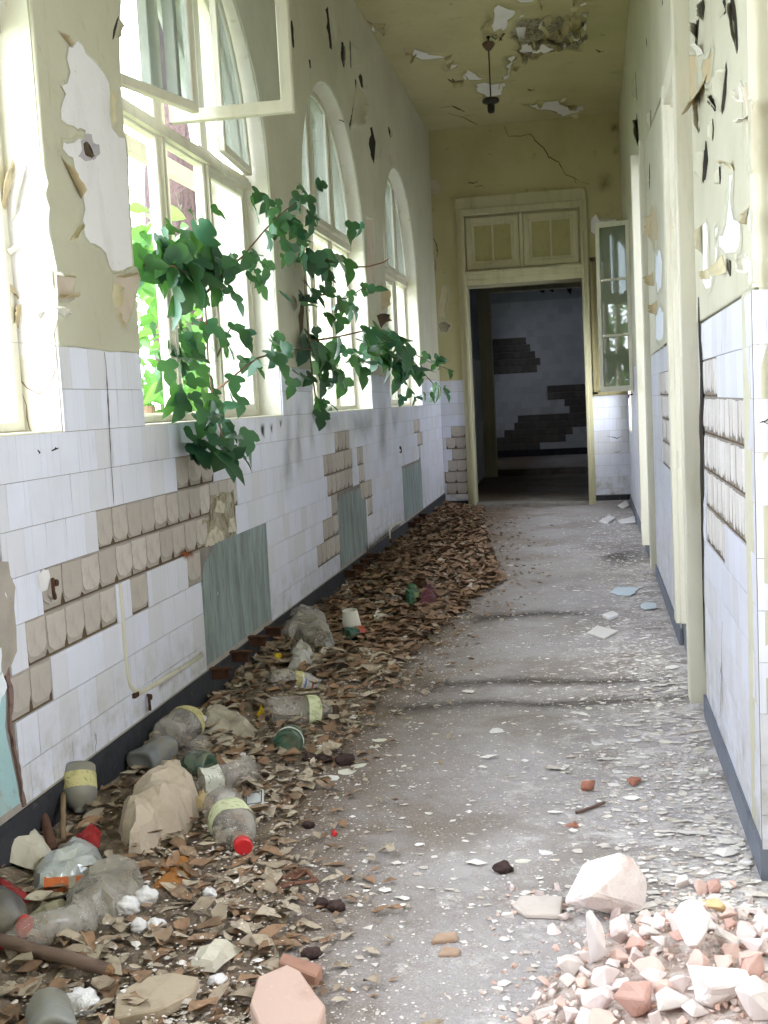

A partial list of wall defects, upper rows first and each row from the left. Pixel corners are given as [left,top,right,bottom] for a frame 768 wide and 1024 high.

peeling [58,30,141,339]
peeling [402,0,594,100]
crack [490,127,587,184]
peeling [519,97,589,119]
peeling [681,0,755,296]
peeling [642,194,665,351]
spalling [4,456,237,807]